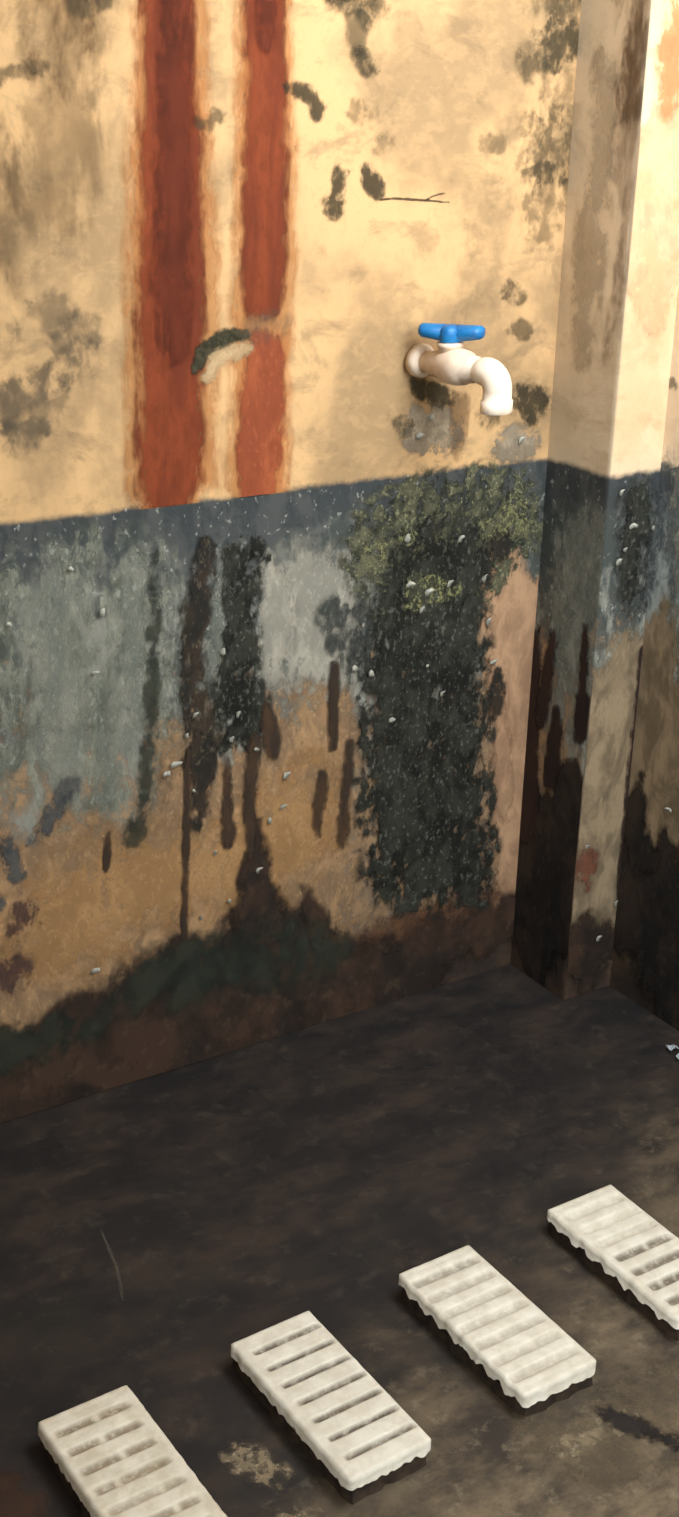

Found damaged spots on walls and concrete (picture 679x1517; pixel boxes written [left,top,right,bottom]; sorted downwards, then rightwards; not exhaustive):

leakage [355,48,380,77]
leakage [541,18,579,74]
leakage [284,82,325,122]
leakage [324,163,385,220]
corrosion [124,0,297,509]
leakage [179,536,296,832]
leakage [0,624,679,1123]